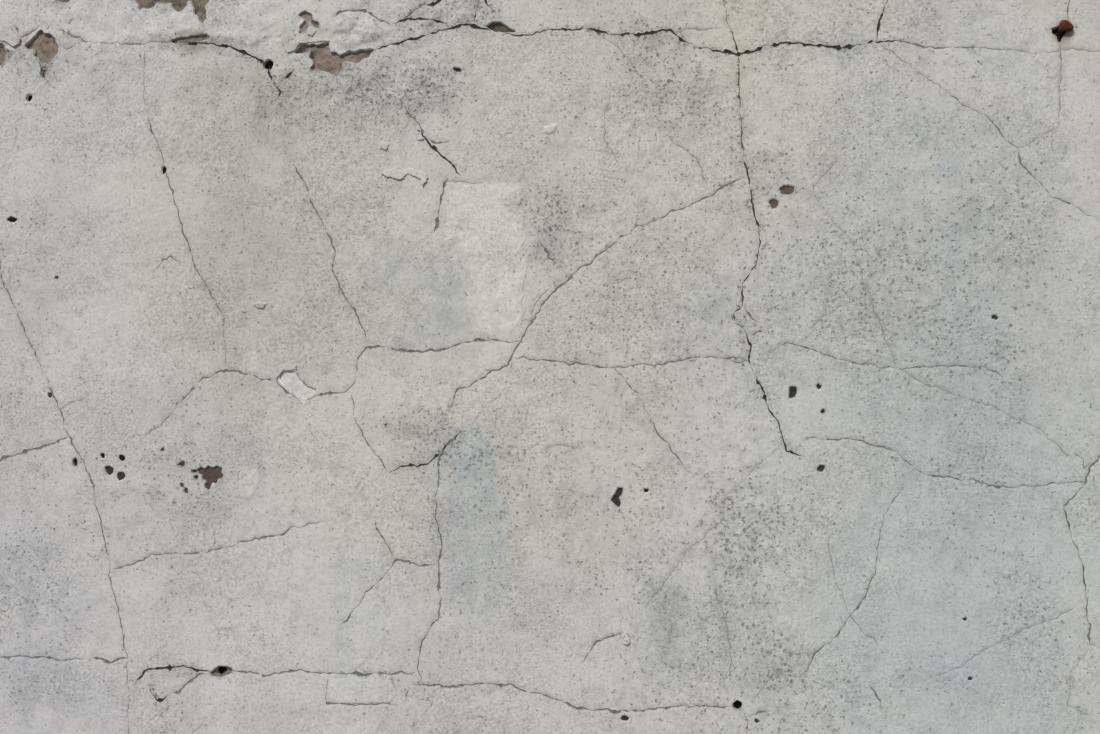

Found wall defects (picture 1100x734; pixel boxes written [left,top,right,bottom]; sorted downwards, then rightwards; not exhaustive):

peeling [0,24,86,85]
crack [61,30,281,99]
peeling [137,0,209,43]
peeling [284,12,373,75]
corrosion [1043,15,1078,87]
crack [919,44,1099,220]
crack [143,0,1037,715]
crack [769,160,1100,717]
crack [0,272,321,734]
crack [742,711,766,734]